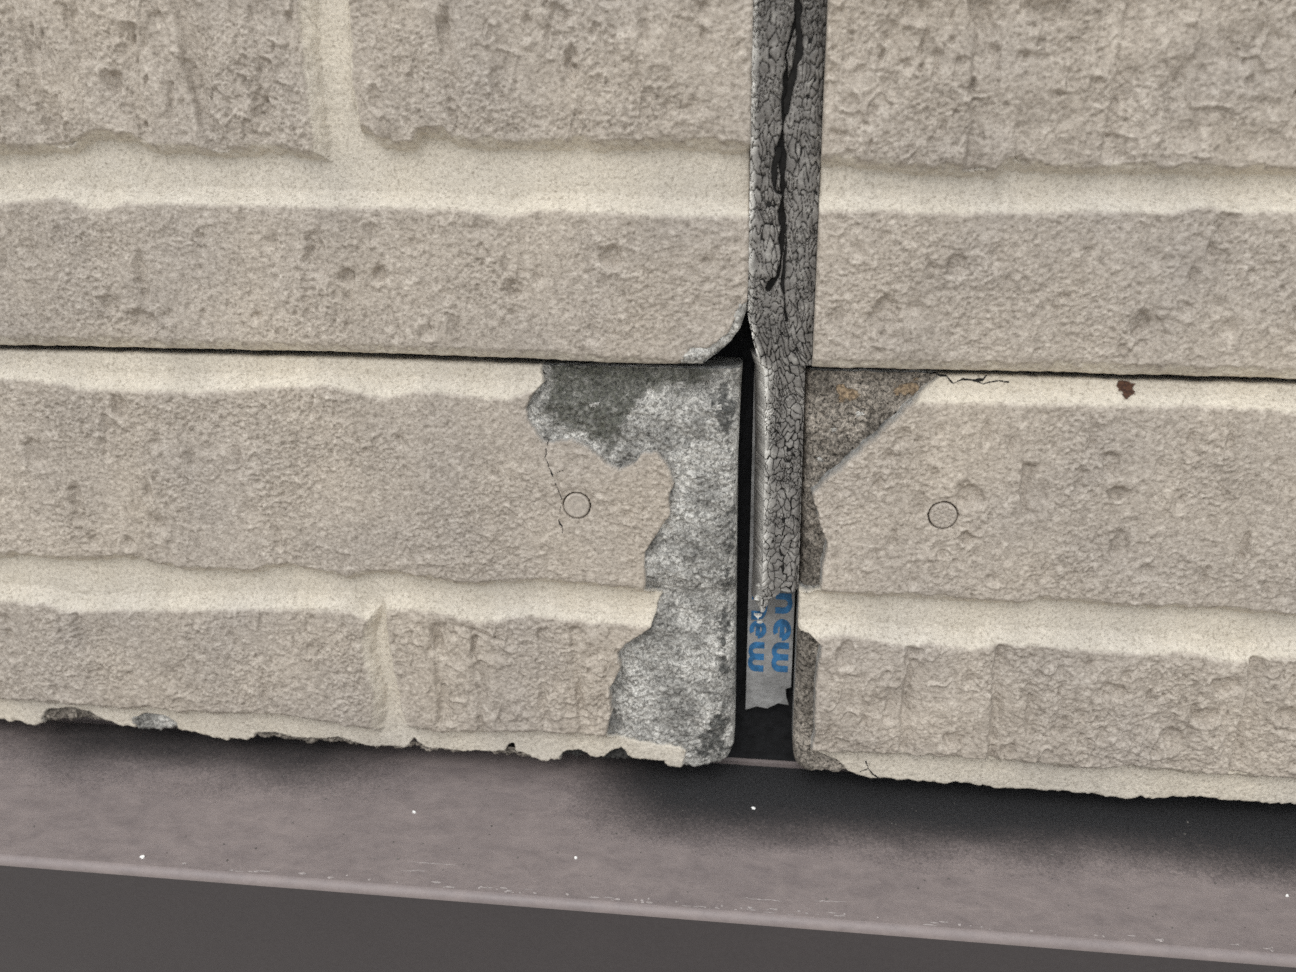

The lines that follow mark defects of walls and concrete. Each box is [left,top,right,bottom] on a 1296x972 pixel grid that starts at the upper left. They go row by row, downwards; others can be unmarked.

spalling [527,301,747,767]
crack [748,0,826,608]
spalling [799,367,938,586]
corrosion [1117,380,1135,399]